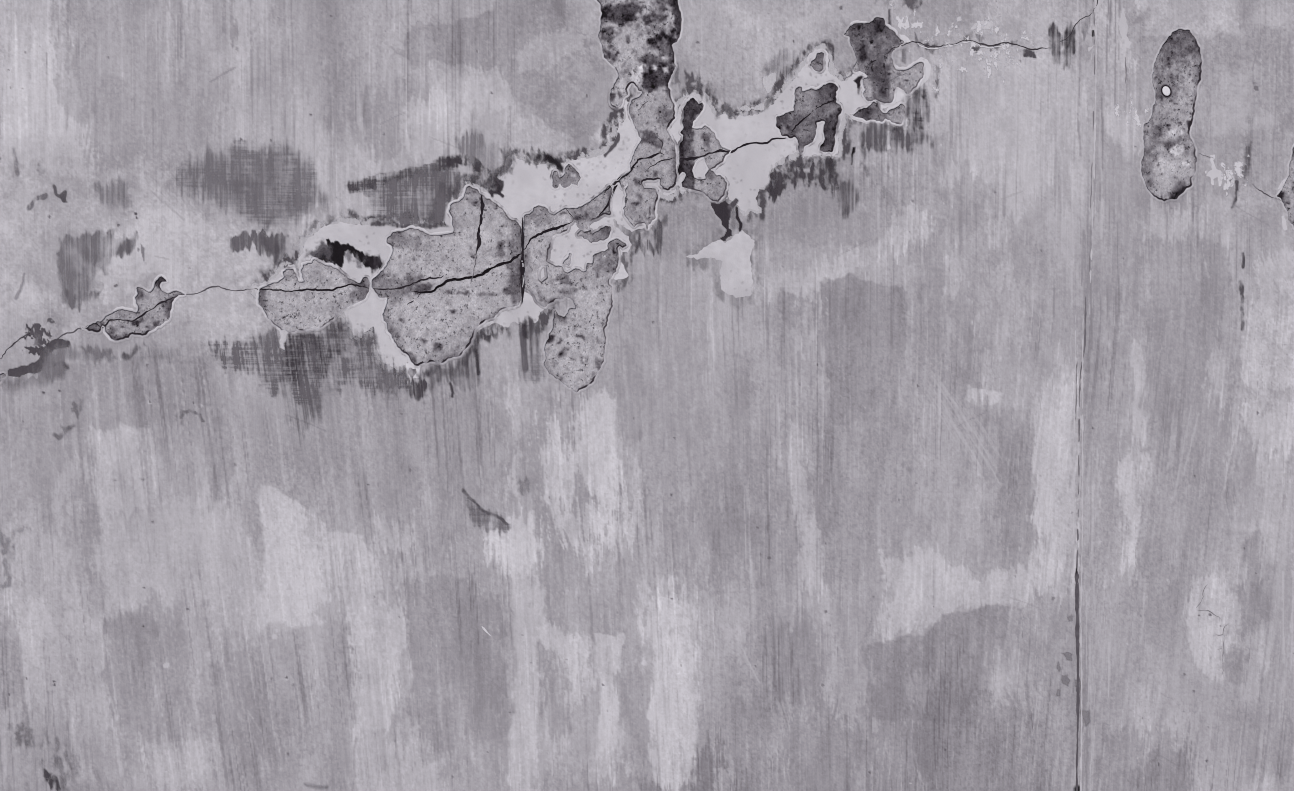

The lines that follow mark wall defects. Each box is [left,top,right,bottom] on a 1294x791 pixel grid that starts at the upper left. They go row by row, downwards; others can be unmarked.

crack [59,0,1098,338]
flaking render [250,0,931,395]
flaking render [1139,27,1242,204]
flaking render [1275,143,1294,231]
flaking render [80,274,187,343]